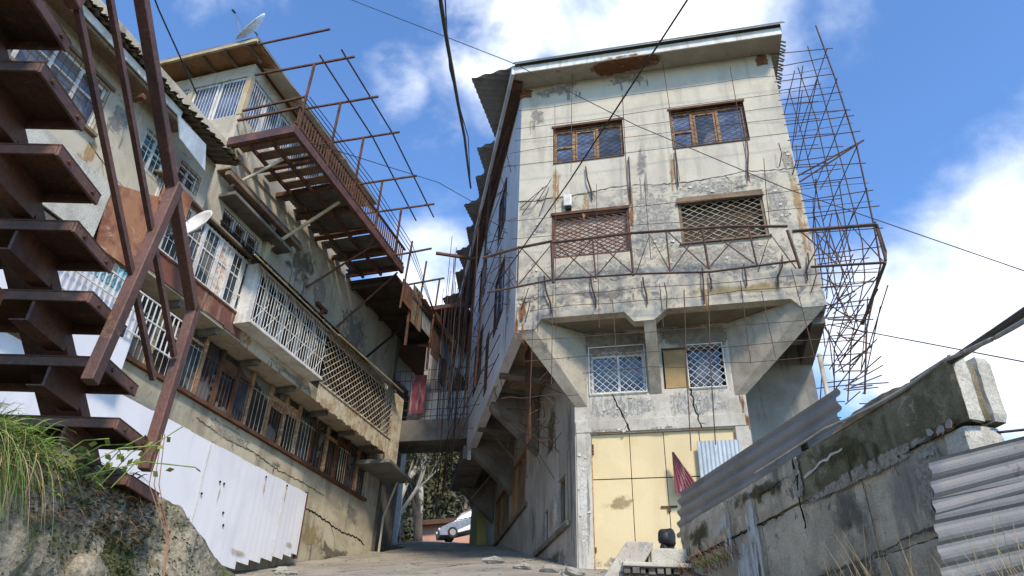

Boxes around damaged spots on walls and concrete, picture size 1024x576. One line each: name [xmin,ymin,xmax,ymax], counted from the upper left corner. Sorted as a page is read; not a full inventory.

corrosion [149,254,184,297]
corrosion [195,282,251,350]
crack [612,394,630,431]
crack [690,388,704,428]
crack [196,417,364,545]